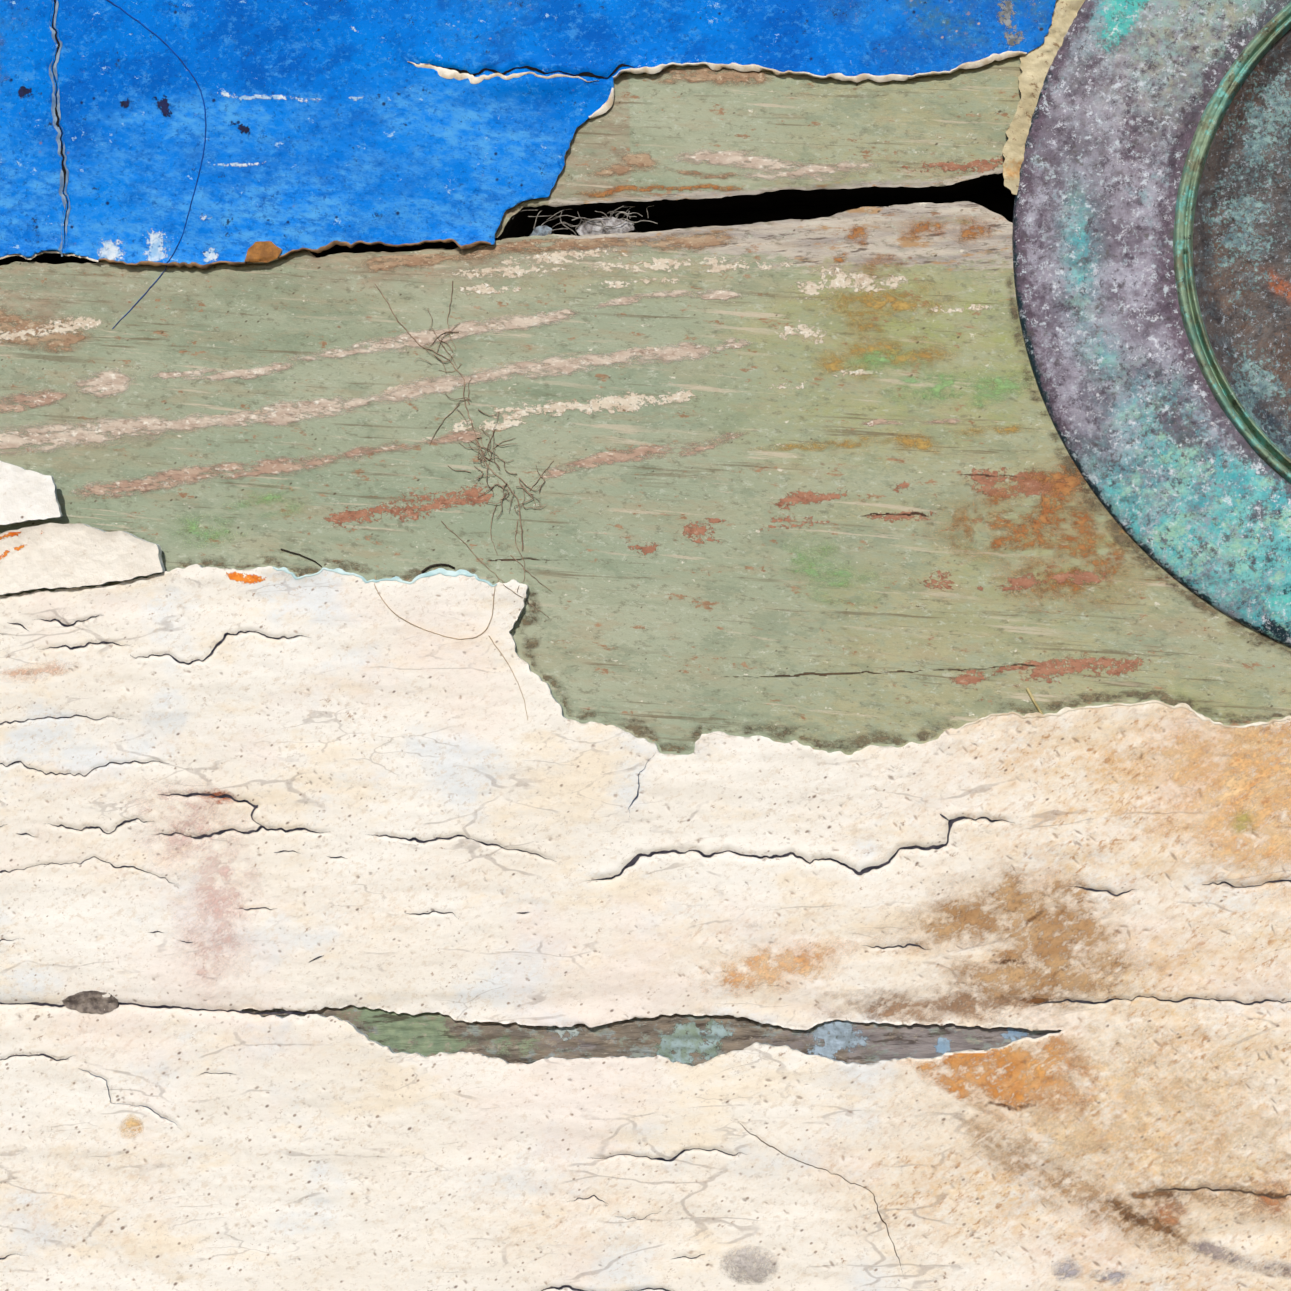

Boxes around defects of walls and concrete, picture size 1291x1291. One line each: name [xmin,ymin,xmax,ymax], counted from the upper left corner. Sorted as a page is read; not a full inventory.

peeling [0,1,1039,406]
peeling [0,338,749,595]
peeling [961,433,1291,654]
crack [0,615,310,665]
peeling [726,656,1291,729]
crack [0,760,347,885]
crack [368,834,554,861]
crack [587,813,1013,881]
spalling [62,990,119,1014]
crack [109,1002,315,1015]
spalling [242,1005,1061,1066]
crack [1033,996,1291,1006]